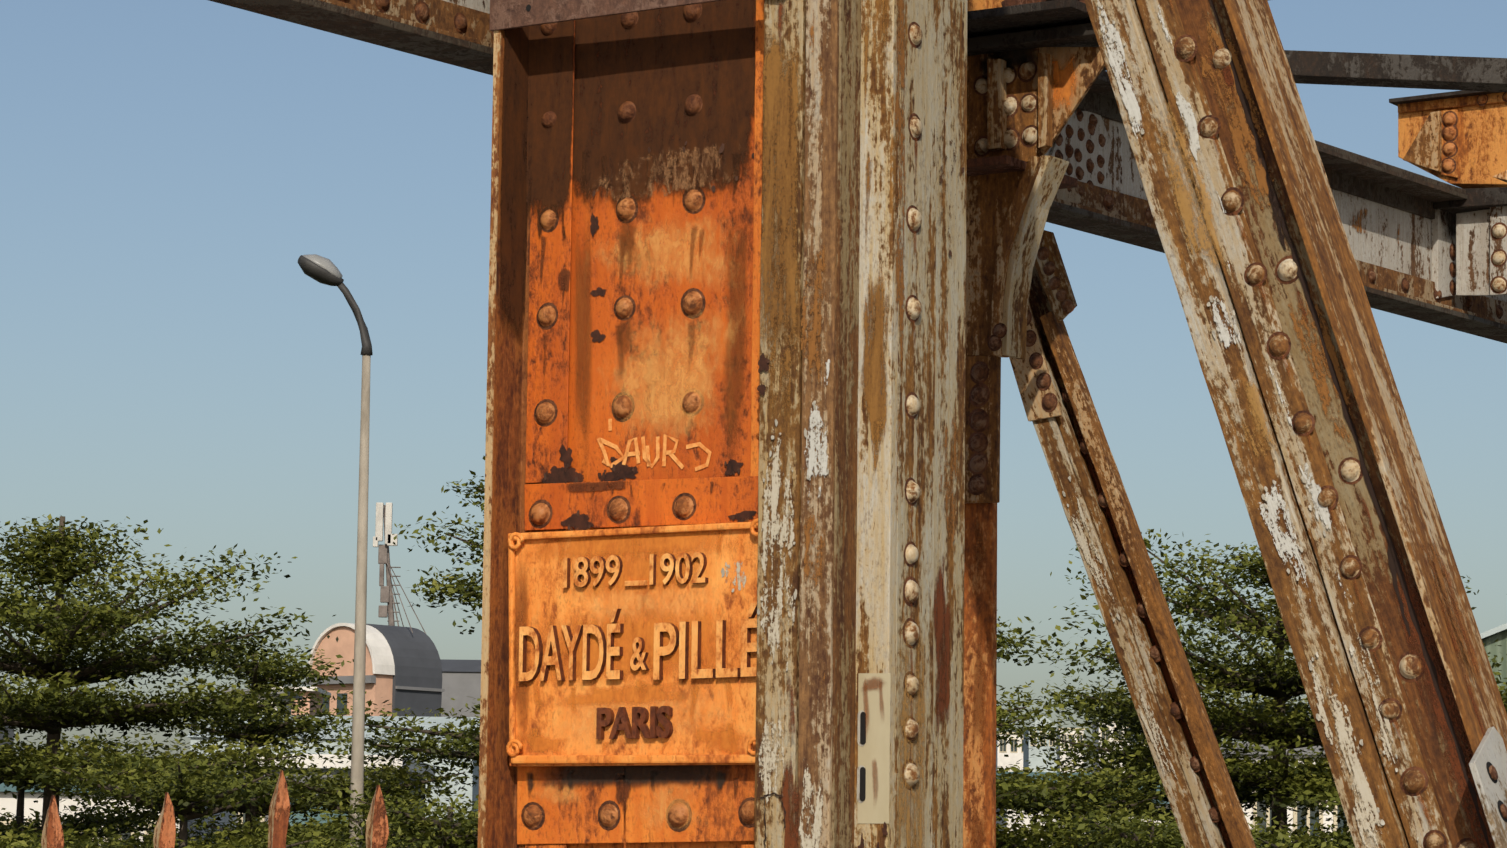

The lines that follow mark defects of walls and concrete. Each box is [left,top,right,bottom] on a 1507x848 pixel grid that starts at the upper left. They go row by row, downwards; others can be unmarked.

peeling [1097,1,1145,139]
peeling [1176,89,1226,213]
rust [1201,20,1287,237]
rust [540,237,630,427]
peeling [1207,296,1241,349]
rust [516,586,712,712]
rust [544,531,722,594]
rust [898,416,958,848]
peeling [1062,476,1120,622]
rust [1060,389,1233,848]
peeling [1299,463,1332,536]
peeling [1138,688,1178,779]